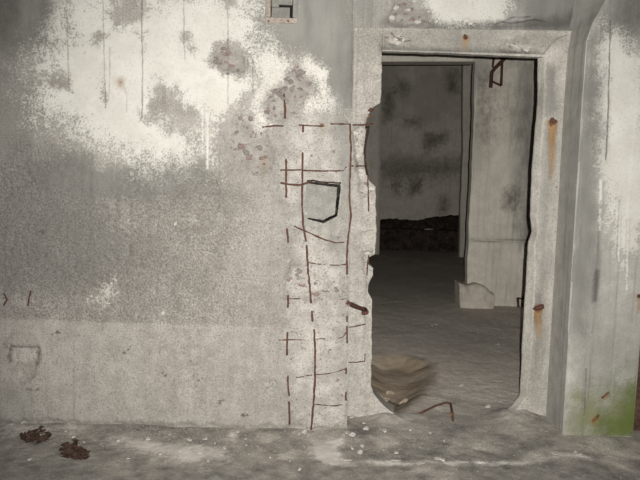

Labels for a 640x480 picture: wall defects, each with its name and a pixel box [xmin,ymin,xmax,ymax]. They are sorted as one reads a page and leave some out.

peeling [3,0,434,430]
peeling [382,0,517,47]